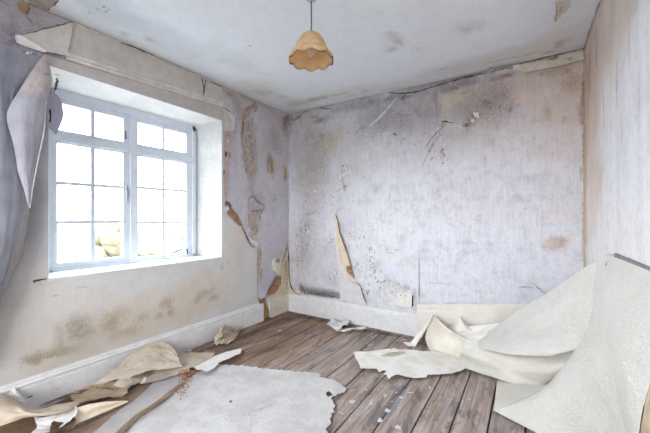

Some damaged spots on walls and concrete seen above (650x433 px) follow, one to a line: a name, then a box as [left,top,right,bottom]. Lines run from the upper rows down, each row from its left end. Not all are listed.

crack [369,3,599,168]
peeling [488,51,584,73]
peeling [554,1,571,22]
flaking render [223,103,263,285]
flaking render [258,185,318,320]